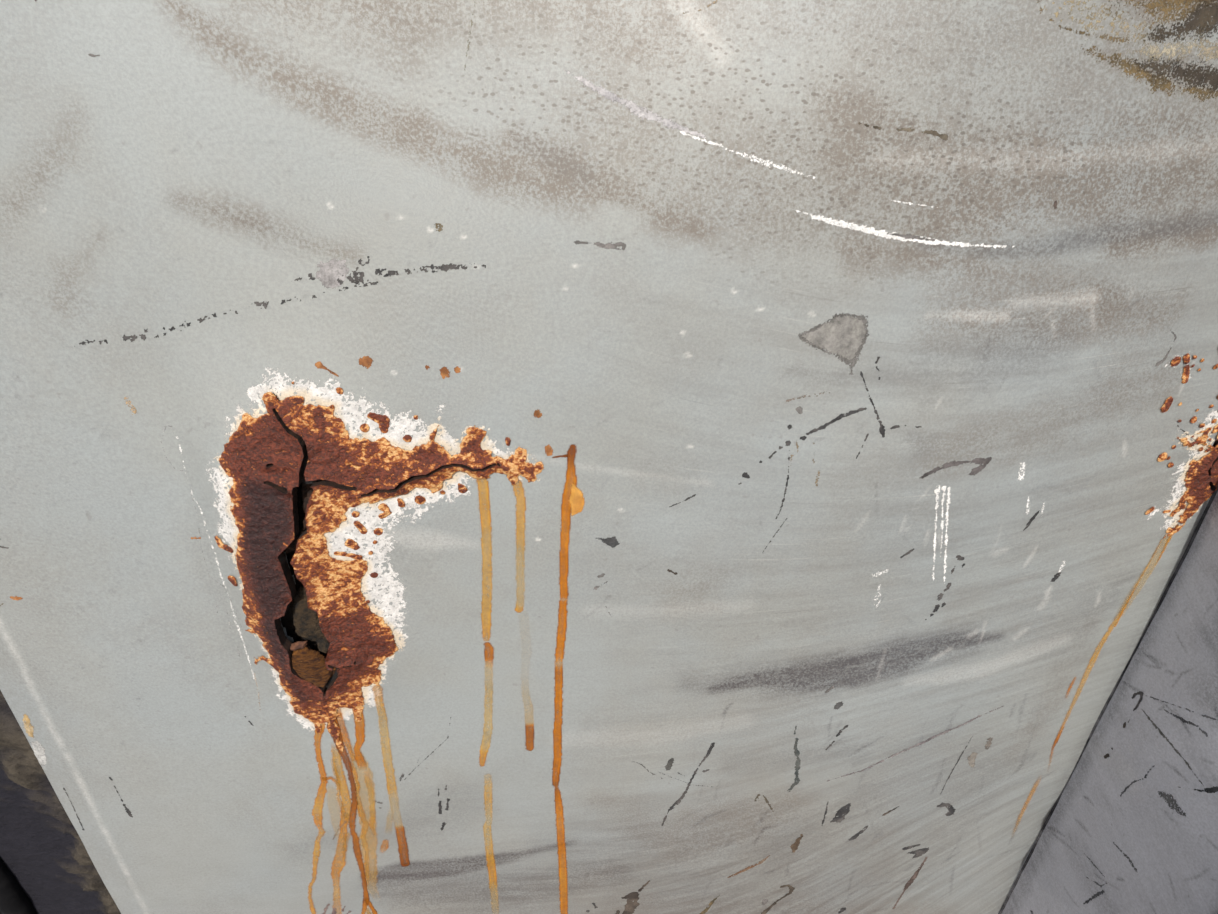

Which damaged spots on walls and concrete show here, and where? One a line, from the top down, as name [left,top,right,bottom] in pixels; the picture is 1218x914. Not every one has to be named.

corrosion [1165,352,1218,384]
corrosion [191,361,584,914]
corrosion [1052,396,1218,751]